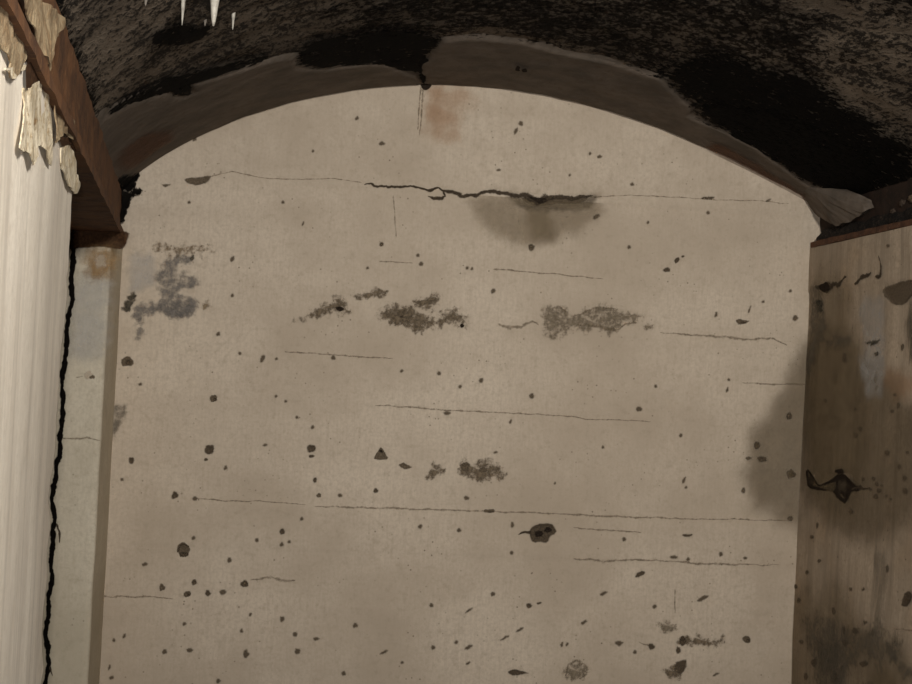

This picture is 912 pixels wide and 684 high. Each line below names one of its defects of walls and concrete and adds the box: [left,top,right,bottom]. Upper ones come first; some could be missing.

peeling [0,6,27,79]
peeling [24,0,66,71]
peeling [19,81,80,194]
crack [364,183,593,205]
damp [123,243,209,335]
crack [43,249,96,684]